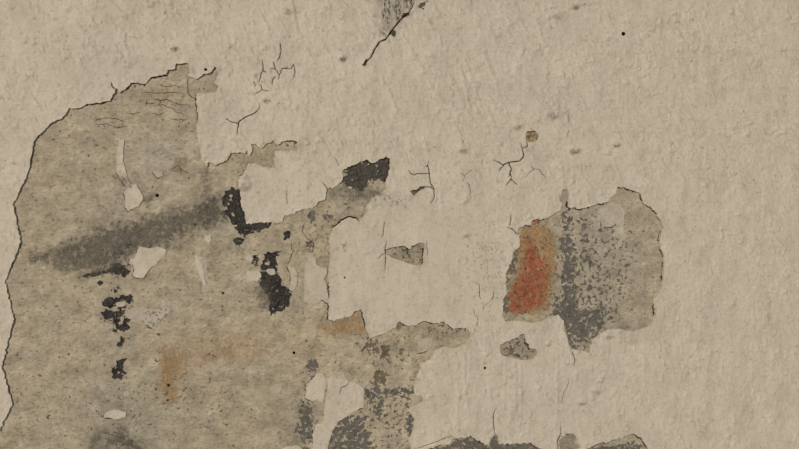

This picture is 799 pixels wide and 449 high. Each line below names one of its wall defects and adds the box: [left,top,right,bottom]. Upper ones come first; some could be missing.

crack [363,2,425,66]
crack [227,43,295,132]
crack [493,141,544,184]
spalling [526,130,538,142]
peeling [0,63,471,449]
corrosion [509,220,556,315]
peeling [502,187,664,353]
peeling [500,334,537,360]
peeling [434,433,540,449]
peeling [559,433,648,449]